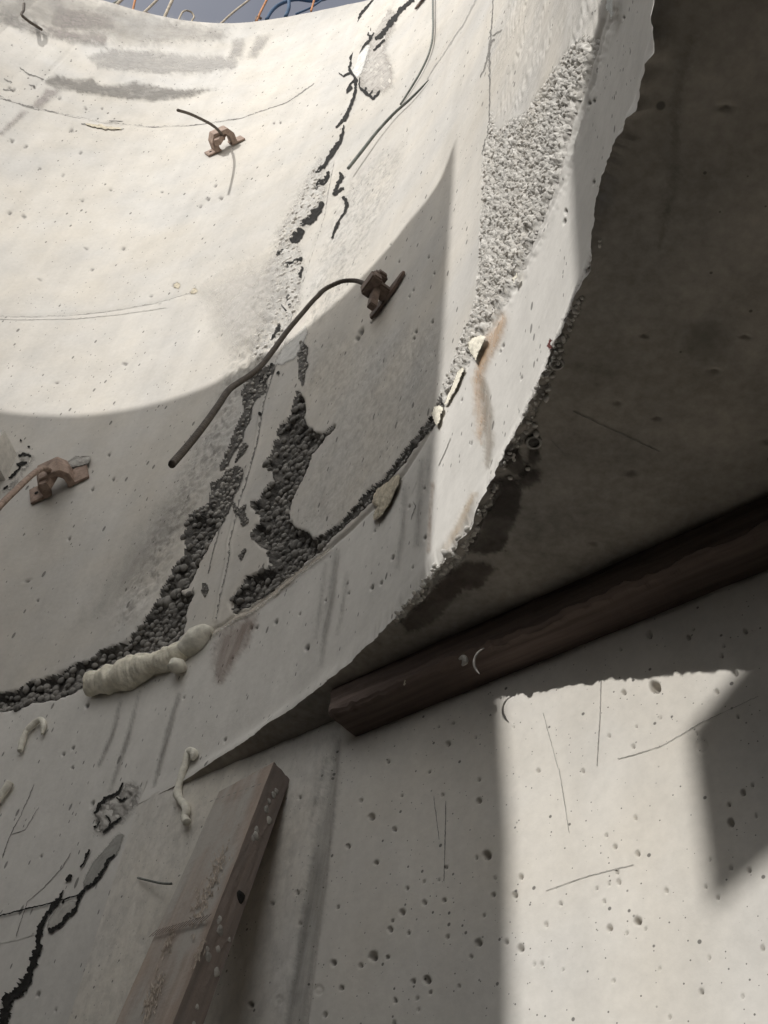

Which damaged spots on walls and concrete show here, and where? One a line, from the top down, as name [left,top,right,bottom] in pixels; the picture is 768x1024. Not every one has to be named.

spalling [0,34,601,712]
crack [208,0,414,619]
leakage [401,449,541,631]
crack [2,785,39,858]
spalling [93,784,138,833]
crack [0,849,115,1024]